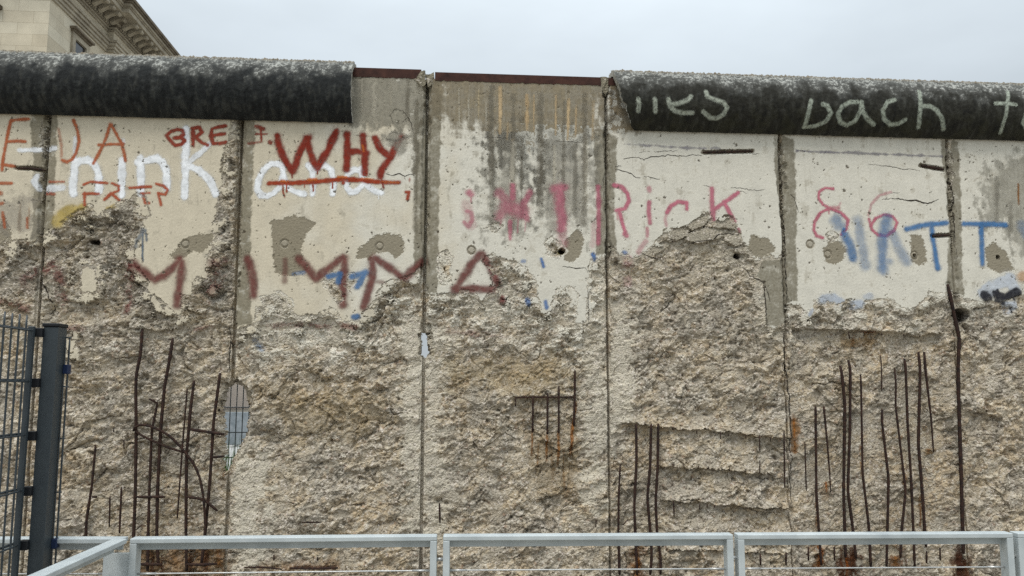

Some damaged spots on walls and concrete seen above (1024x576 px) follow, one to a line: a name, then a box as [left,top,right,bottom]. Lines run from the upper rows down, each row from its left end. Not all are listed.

damp [350,76,634,244]
rust [84,329,224,538]
rust [140,549,229,576]
spalling [0,120,1024,576]
rust [515,370,576,459]
rust [617,546,662,576]
rust [617,423,674,533]
rust [745,360,870,532]
rust [807,545,872,576]
rust [880,352,971,576]
rust [946,284,965,531]